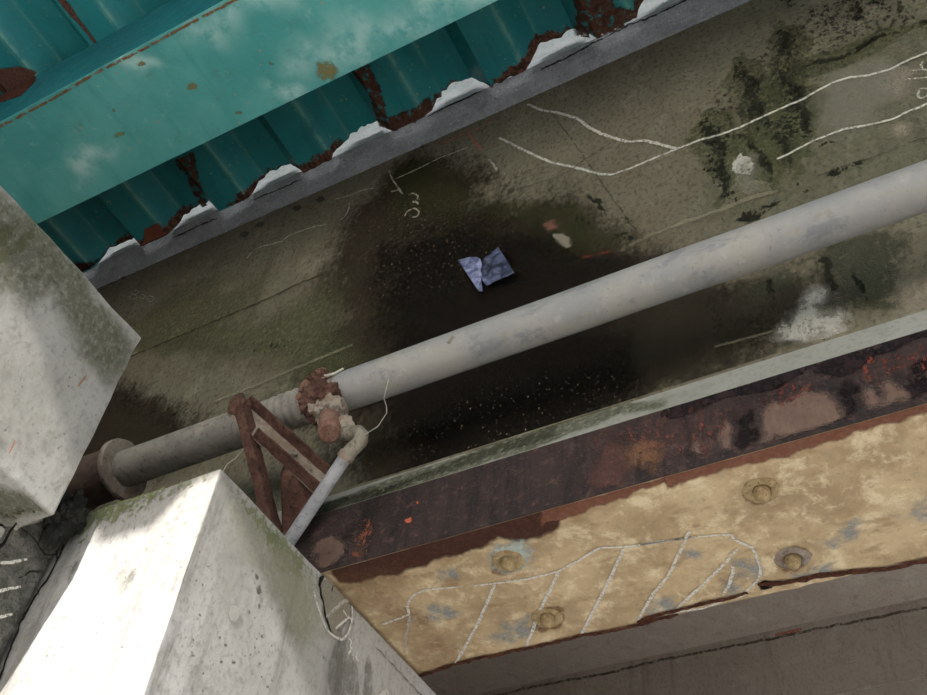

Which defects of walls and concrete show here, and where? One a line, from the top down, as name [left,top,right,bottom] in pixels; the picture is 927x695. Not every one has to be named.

corrosion [0,0,238,127]
corrosion [352,65,432,131]
corrosion [573,0,632,39]
water stain [688,0,927,222]
corrosion [176,153,207,207]
corrosion [74,259,100,272]
water stain [295,151,664,383]
water stain [82,383,203,457]
water stain [348,283,841,484]
corrosion [331,346,927,583]
crack [0,522,65,679]
crack [318,575,333,633]